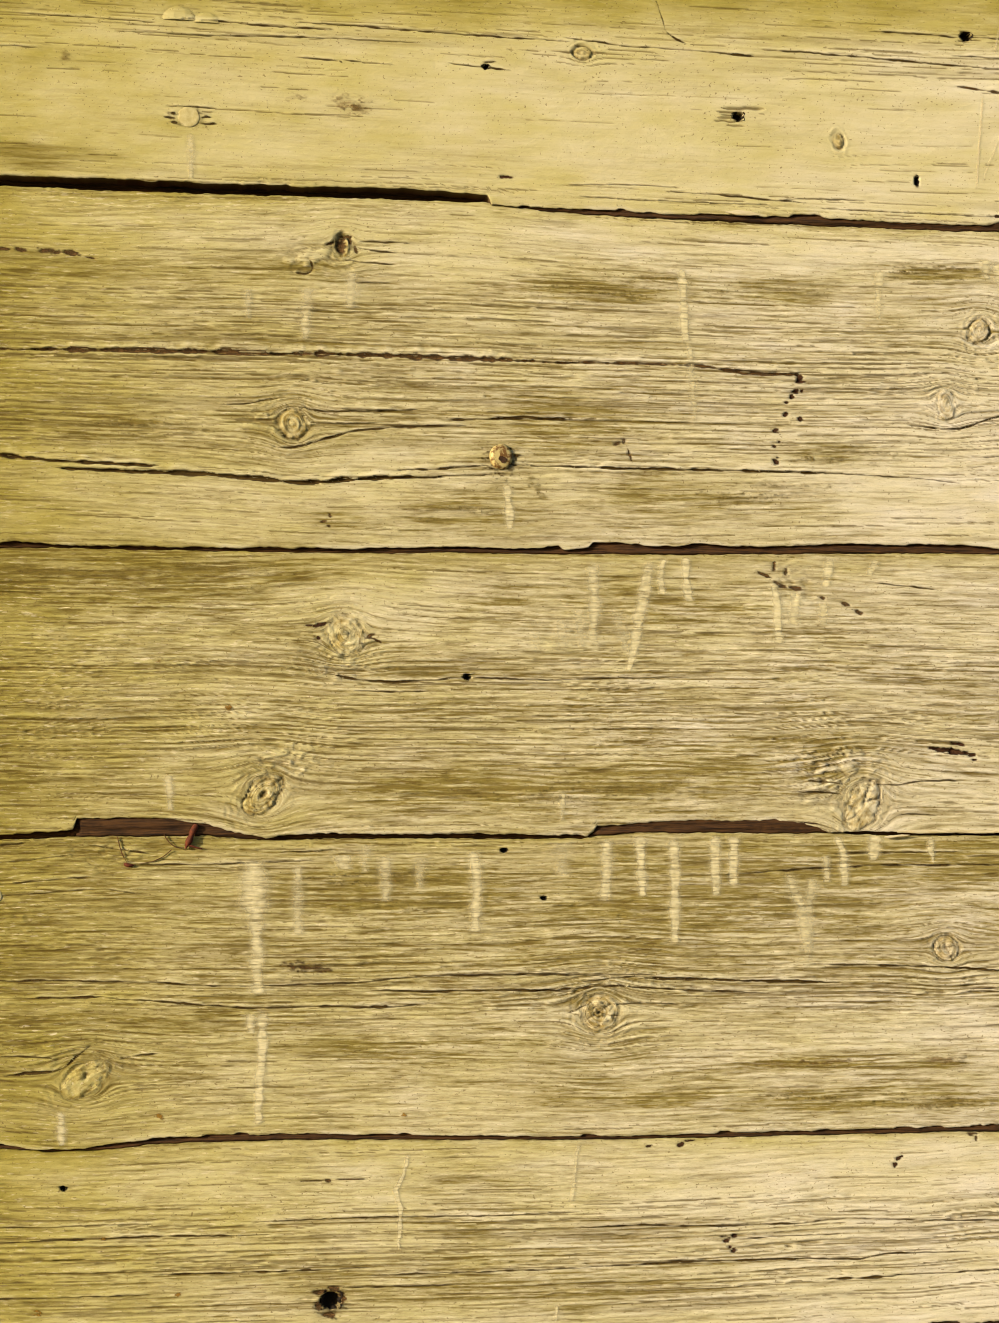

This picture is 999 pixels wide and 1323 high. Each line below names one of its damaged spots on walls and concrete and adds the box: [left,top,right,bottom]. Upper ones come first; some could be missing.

crack [0,409,568,485]
crack [531,465,894,478]
damp [241,862,266,993]
damp [365,849,390,900]
damp [470,853,482,931]
damp [600,840,612,900]
damp [635,838,646,896]
damp [669,842,681,942]
damp [710,837,739,895]
damp [788,838,848,959]
damp [869,835,881,860]
damp [247,1014,268,1123]